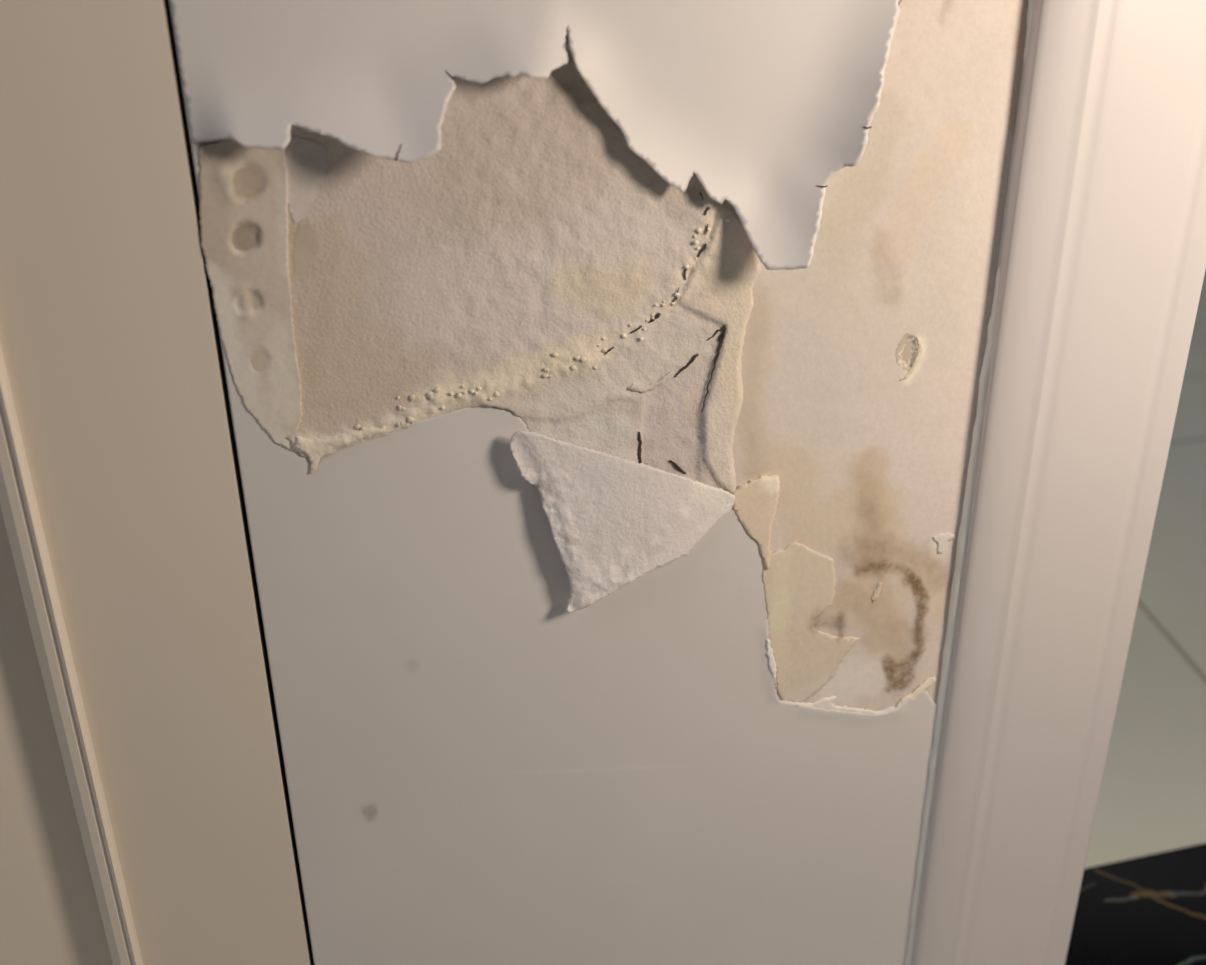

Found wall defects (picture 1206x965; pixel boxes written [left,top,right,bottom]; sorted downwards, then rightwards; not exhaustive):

peeling [170,0,1028,714]